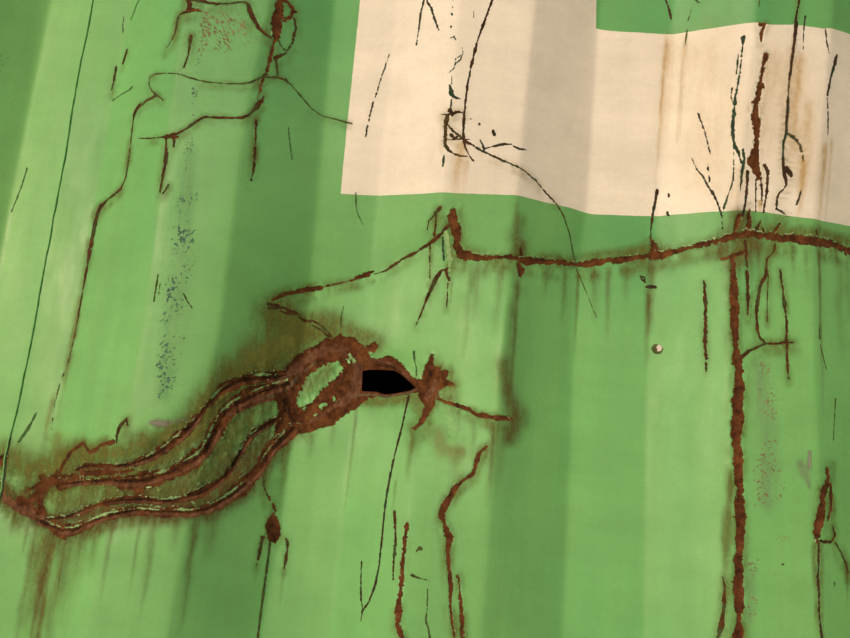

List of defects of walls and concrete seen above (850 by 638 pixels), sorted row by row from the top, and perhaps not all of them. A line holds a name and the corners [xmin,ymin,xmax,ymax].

crack [51,0,390,429]
crack [266,0,850,380]
corrosion [0,301,381,482]
spalling [0,333,456,540]
crack [360,395,489,638]
crack [437,396,513,424]